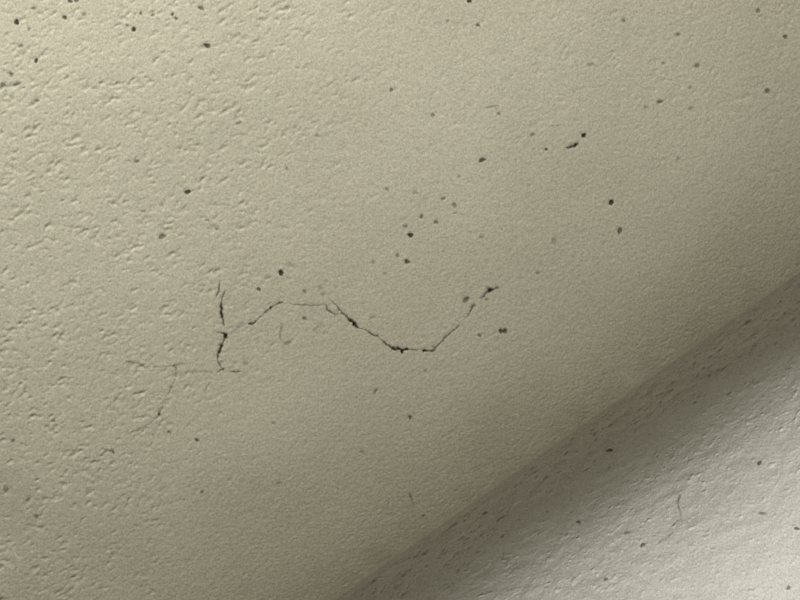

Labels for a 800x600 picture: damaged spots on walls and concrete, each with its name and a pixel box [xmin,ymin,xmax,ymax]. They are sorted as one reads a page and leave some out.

crack [217,293,227,370]
crack [343,313,435,353]